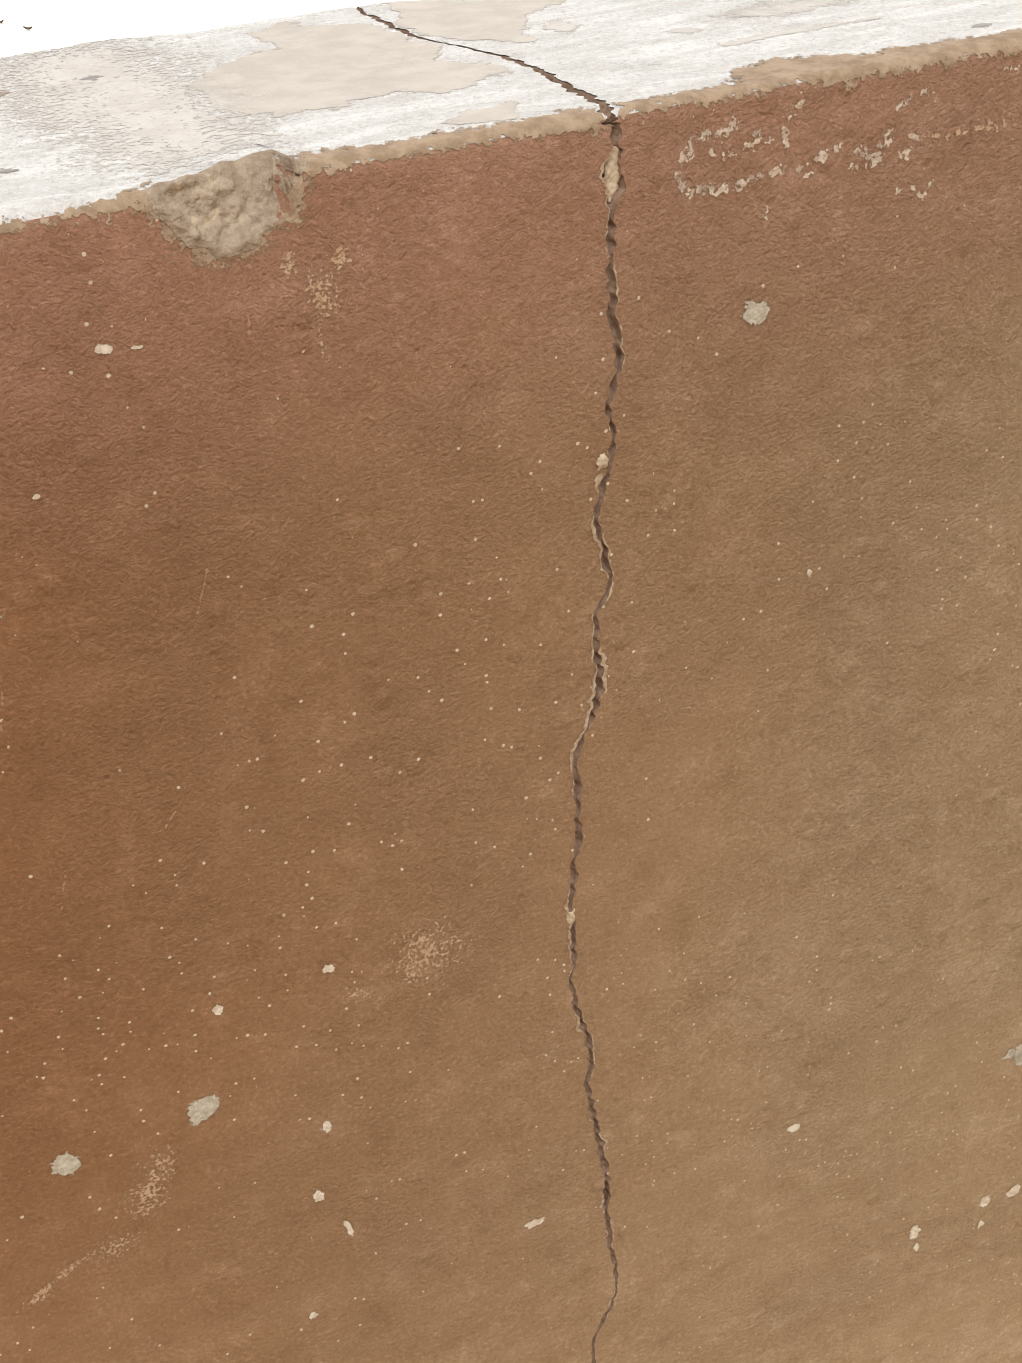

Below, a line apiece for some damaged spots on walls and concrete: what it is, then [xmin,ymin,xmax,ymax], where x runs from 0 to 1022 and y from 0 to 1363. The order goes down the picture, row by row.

peeling [0,0,584,271]
peeling [674,98,923,200]
peeling [895,182,933,201]
peeling [895,87,936,111]
crack [357,8,626,1363]